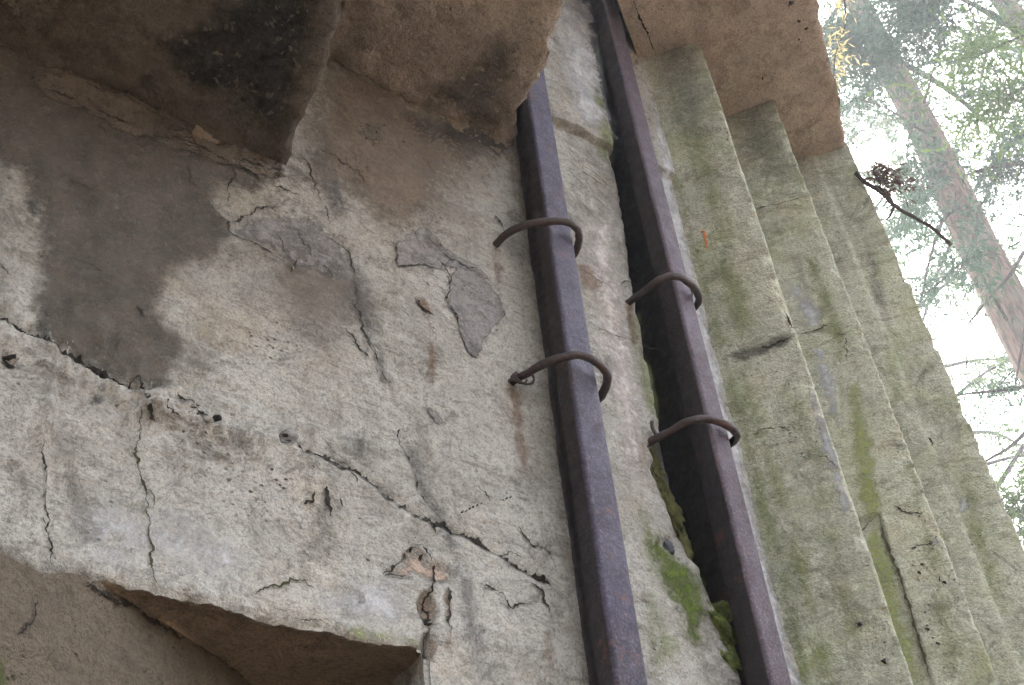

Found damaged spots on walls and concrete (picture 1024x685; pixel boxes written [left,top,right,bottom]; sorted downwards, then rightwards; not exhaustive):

leakage [166,0,317,132]
leakage [0,0,280,388]
crack [188,147,389,387]
peeling [396,227,506,359]
crack [0,318,158,584]
crack [256,577,313,593]
spalling [383,544,452,659]
crack [285,425,567,611]